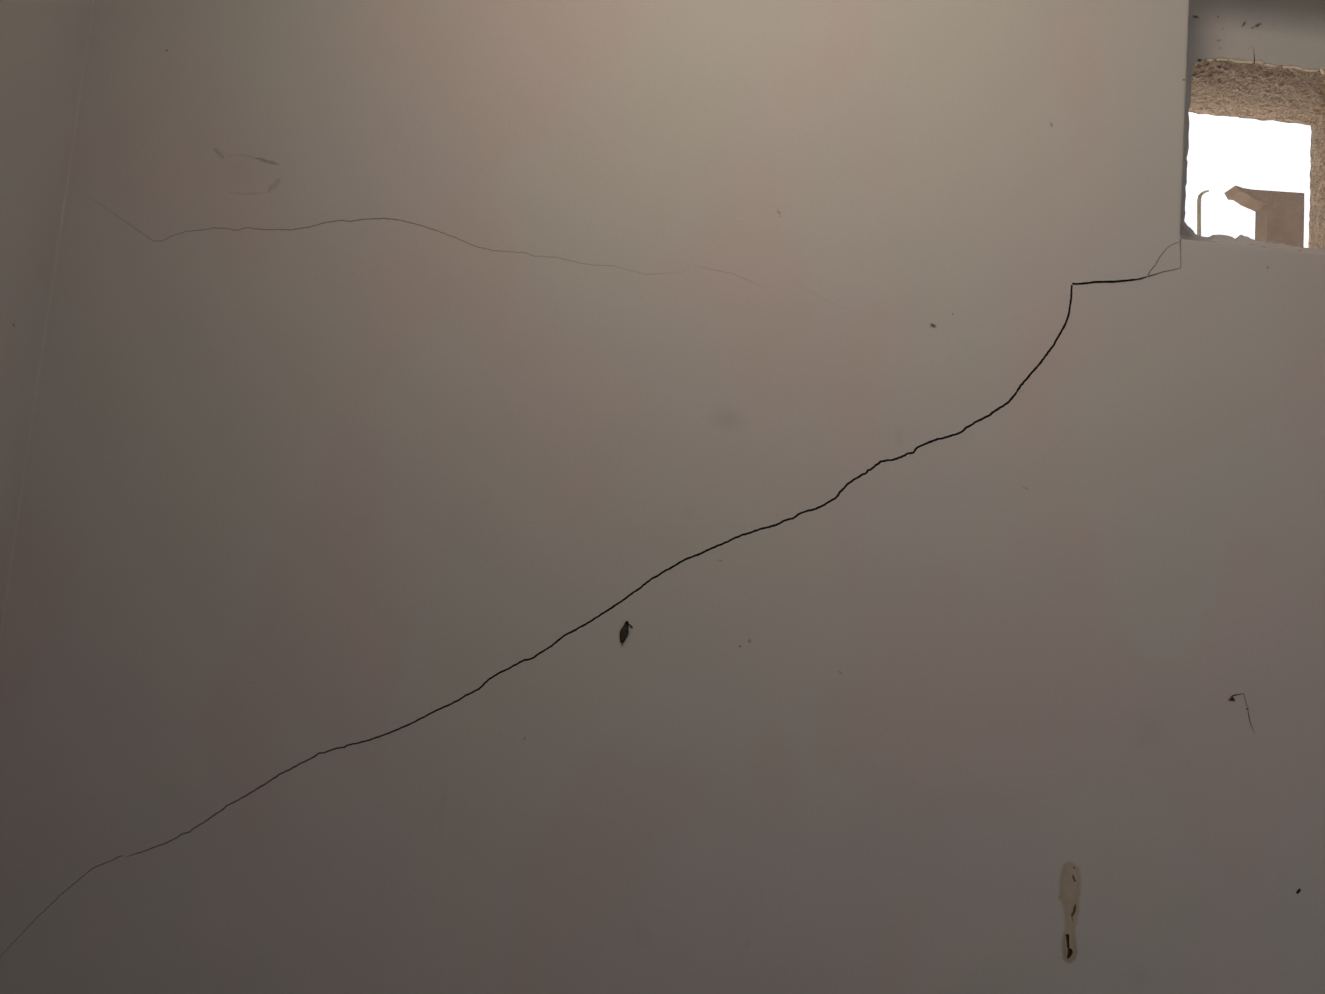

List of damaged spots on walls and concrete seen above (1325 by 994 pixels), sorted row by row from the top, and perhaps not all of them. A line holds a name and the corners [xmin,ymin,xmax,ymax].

crack [79,191,866,315]
crack [0,238,1182,958]